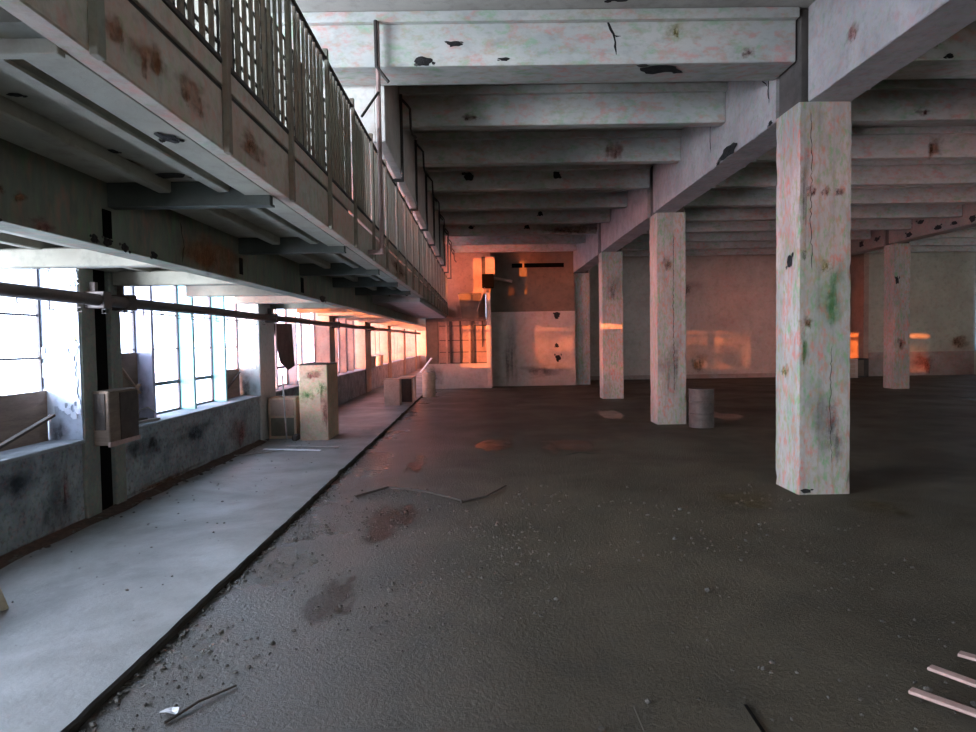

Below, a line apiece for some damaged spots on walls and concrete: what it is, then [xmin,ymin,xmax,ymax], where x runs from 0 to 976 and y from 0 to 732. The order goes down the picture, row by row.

crack [607,22,619,54]
spalling [414,56,435,67]
spalling [637,64,683,74]
flaking render [41,339,81,419]